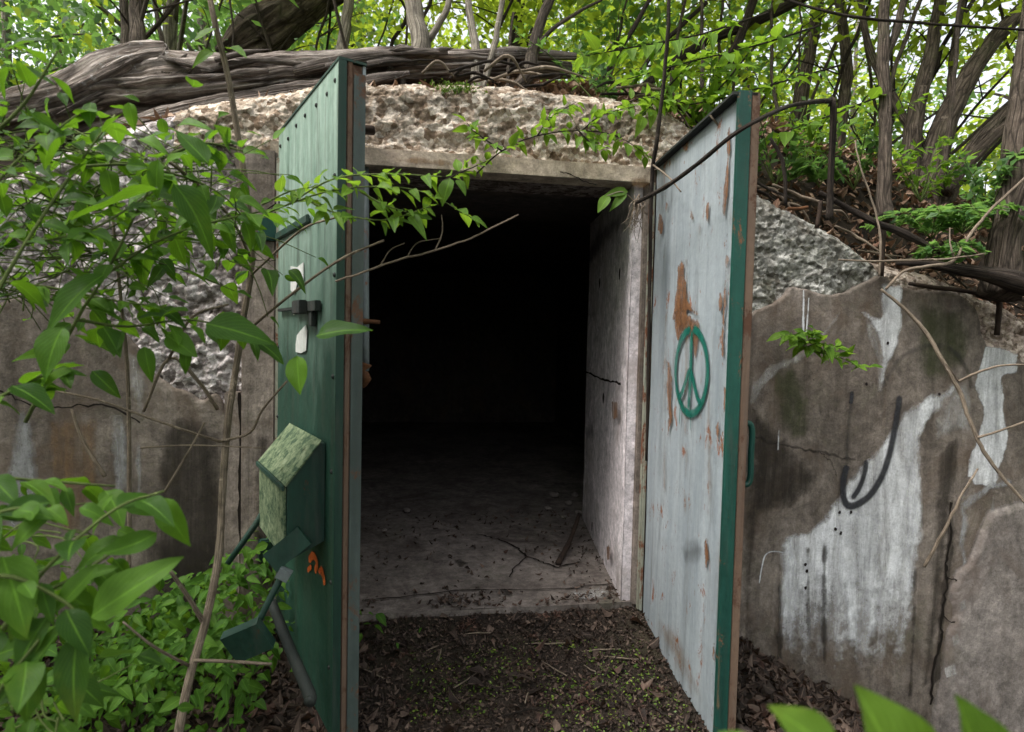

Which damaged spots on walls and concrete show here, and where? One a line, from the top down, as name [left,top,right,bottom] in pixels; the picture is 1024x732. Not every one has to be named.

spalling [365,83,691,167]
spalling [0,86,314,402]
crack [580,370,621,385]
corrosion [673,262,699,358]
spalling [752,195,1024,362]
water stain [151,422,218,617]
crack [365,534,612,600]
water stain [749,417,810,556]
crack [748,434,855,476]
water stain [777,397,940,696]
water stain [930,347,1017,683]